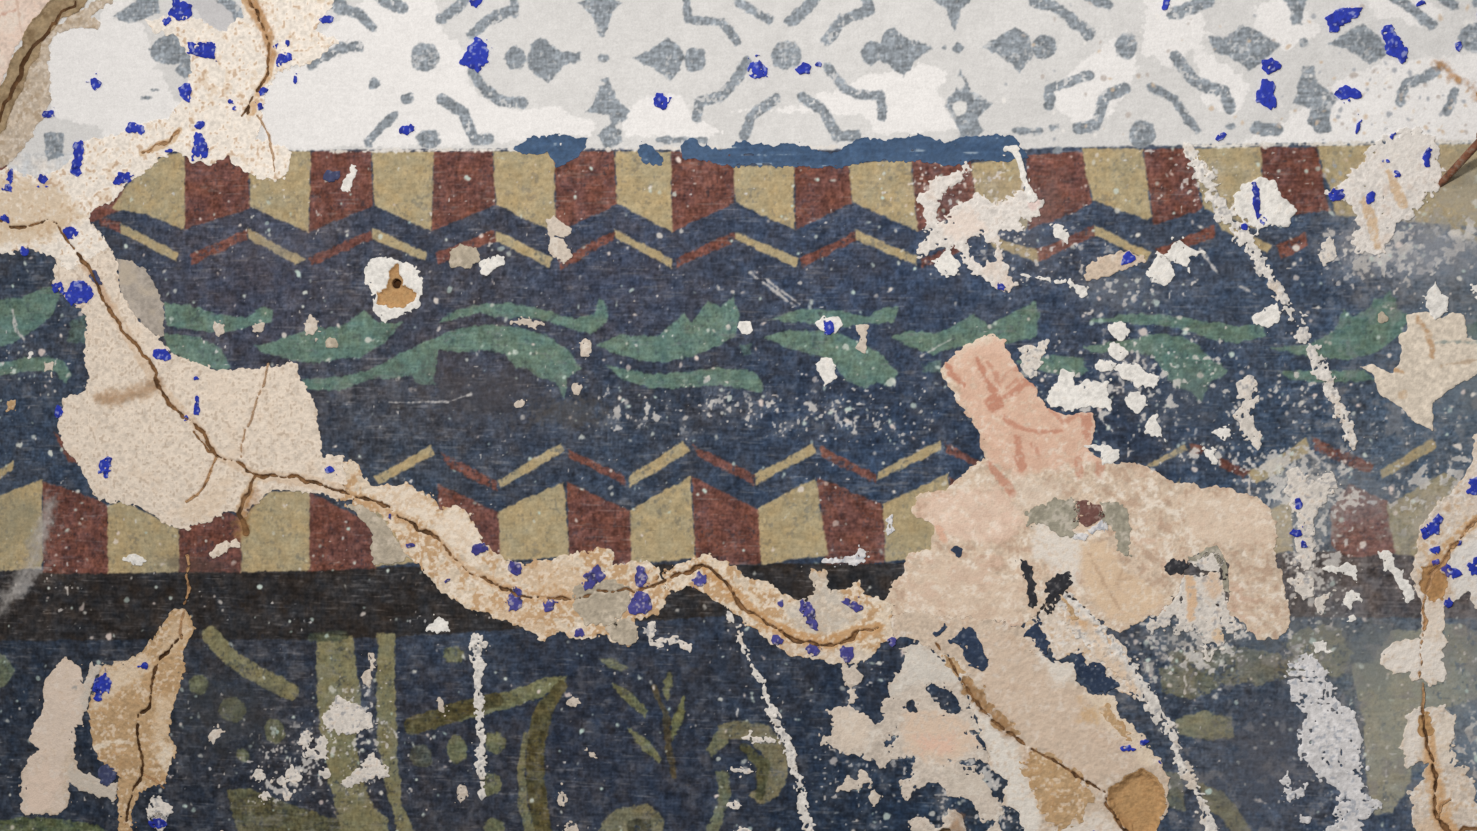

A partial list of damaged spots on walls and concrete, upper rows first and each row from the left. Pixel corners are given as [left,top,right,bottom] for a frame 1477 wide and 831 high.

rust [1436,61,1461,83]
peeling [0,0,672,647]
crack [0,219,879,646]
water stain [1183,142,1365,451]
peeling [1362,281,1477,431]
flaking render [19,608,196,831]
crack [125,554,191,825]
water stain [469,633,488,801]
water stain [726,611,816,831]
peeling [662,334,1291,831]
water stain [1279,653,1385,831]
crack [1418,518,1477,831]